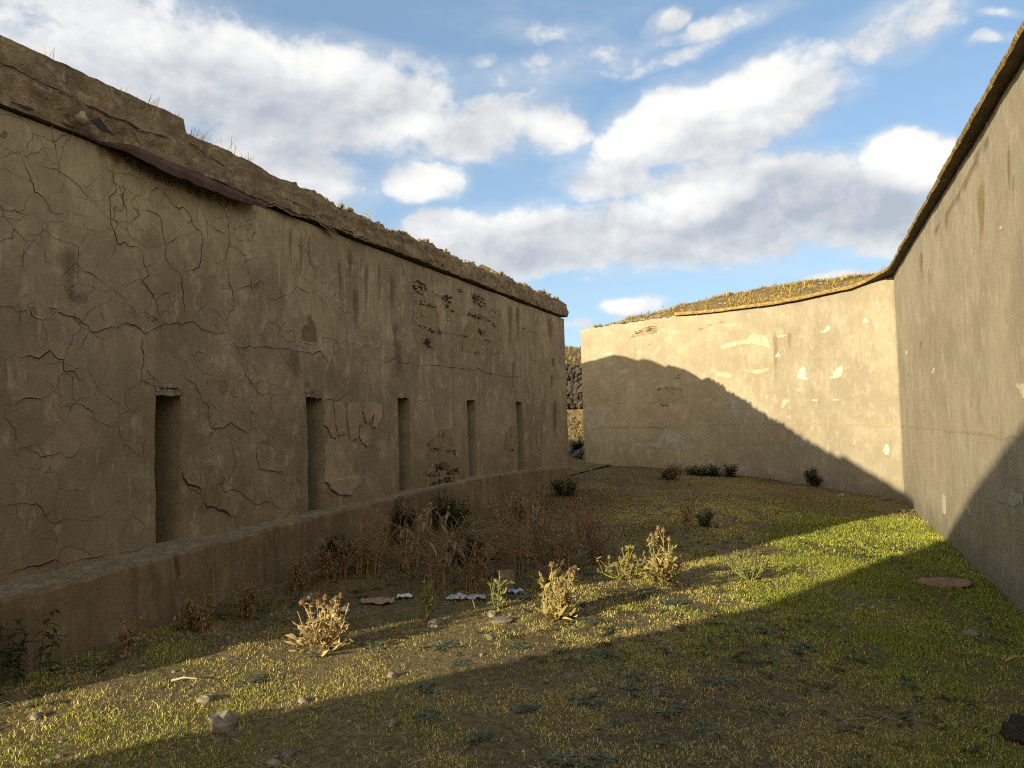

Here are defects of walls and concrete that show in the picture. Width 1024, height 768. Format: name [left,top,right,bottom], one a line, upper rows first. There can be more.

rust [99,145,236,205]
crack [0,60,546,521]
spalling [410,280,504,357]
peeling [720,333,787,357]
peeling [725,397,756,409]
peeling [781,366,818,409]
flaking render [305,385,382,498]
spalling [423,427,466,487]
crack [1,500,102,525]
crack [0,544,148,577]